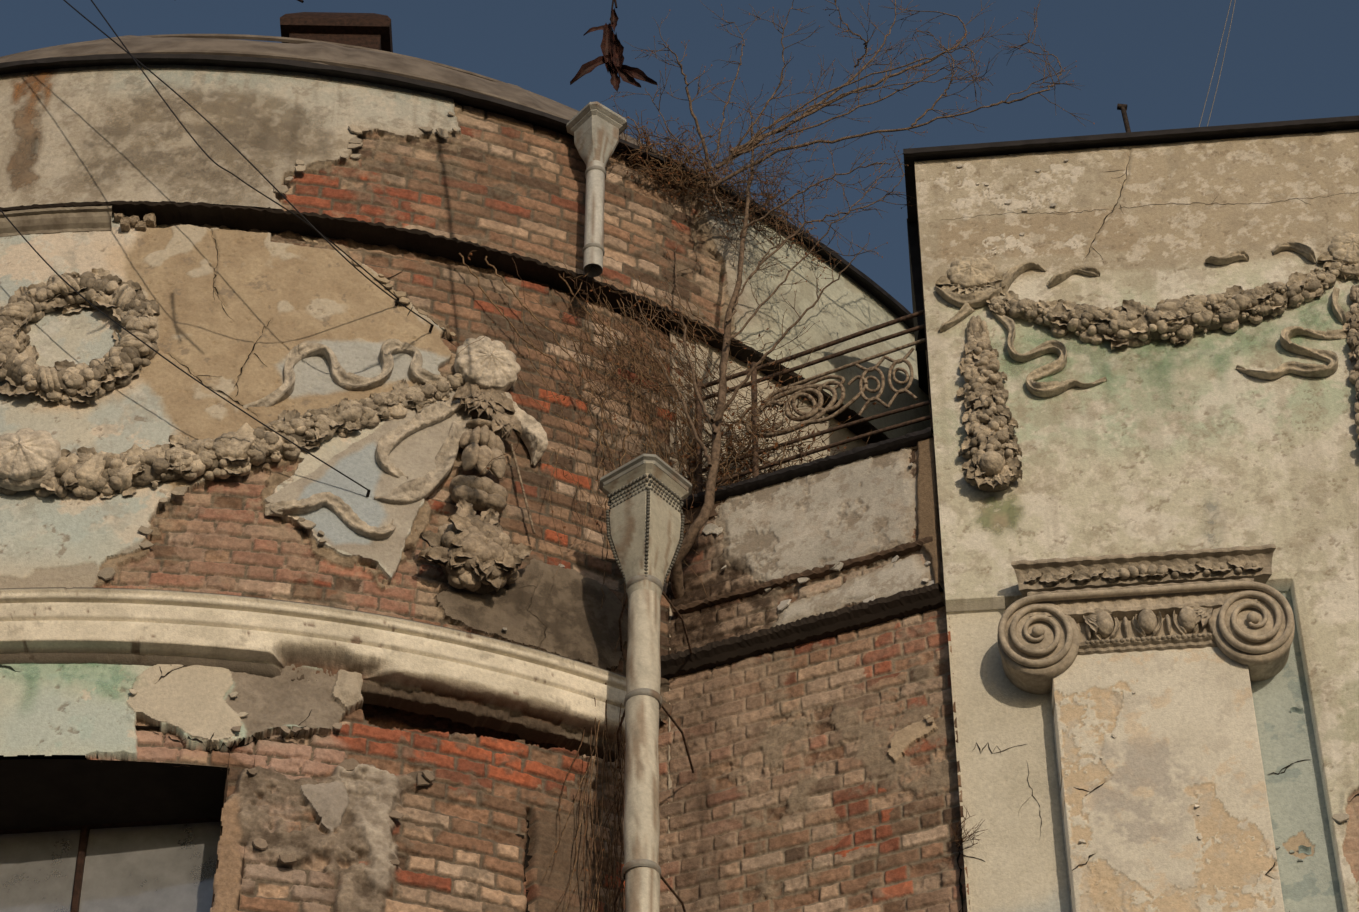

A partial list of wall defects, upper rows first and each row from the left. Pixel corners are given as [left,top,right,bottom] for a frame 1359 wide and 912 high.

water stain [7,95,42,190]
flaking render [274,103,737,340]
crack [947,159,1358,264]
crack [163,229,270,417]
flaking render [93,230,696,676]
flaking render [702,447,934,627]
flaking render [211,669,626,912]
flaking render [659,677,672,724]
crack [973,742,1042,840]
peeling [1054,690,1114,817]
peeling [1079,782,1316,912]
flaking render [1332,787,1359,909]